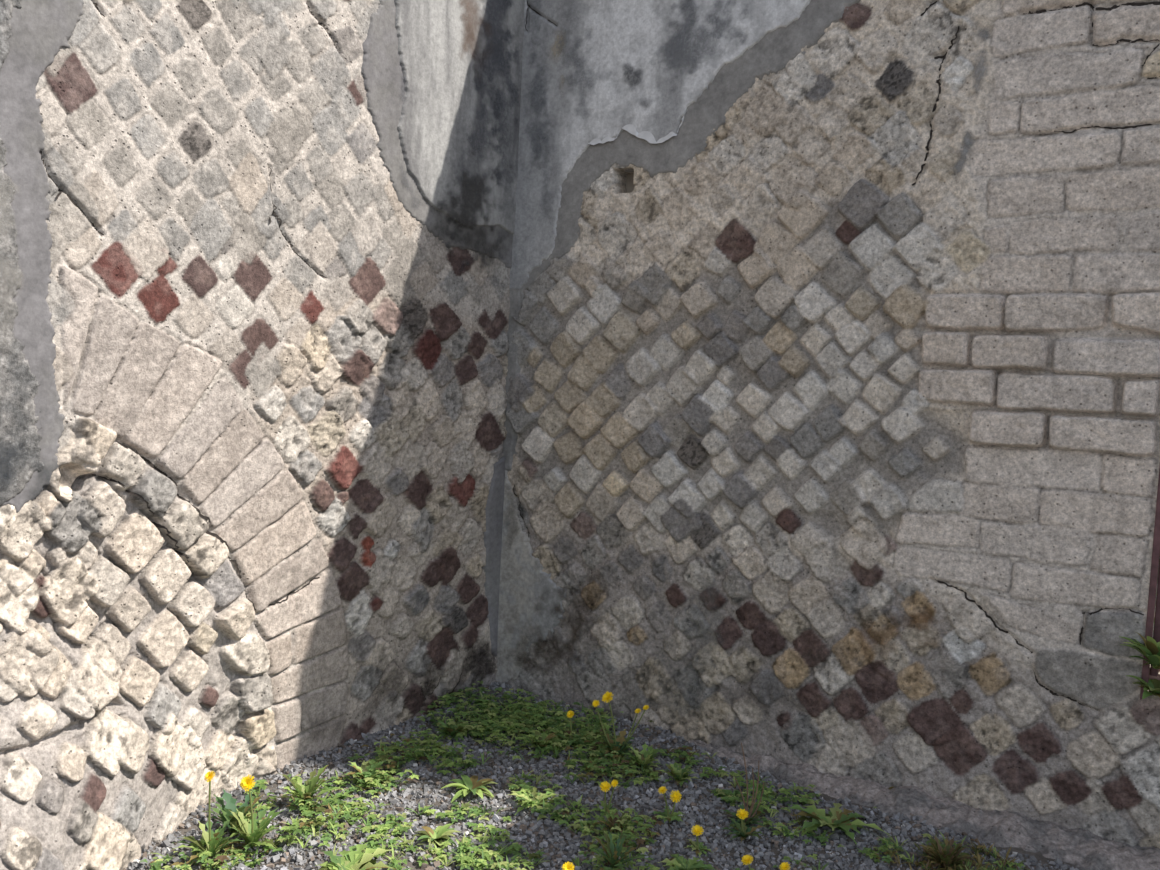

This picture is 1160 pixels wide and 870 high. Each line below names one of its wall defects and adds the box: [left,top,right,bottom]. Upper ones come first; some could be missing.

damp [473,0,515,157]
peeling [394,0,811,291]
crack [912,26,959,186]